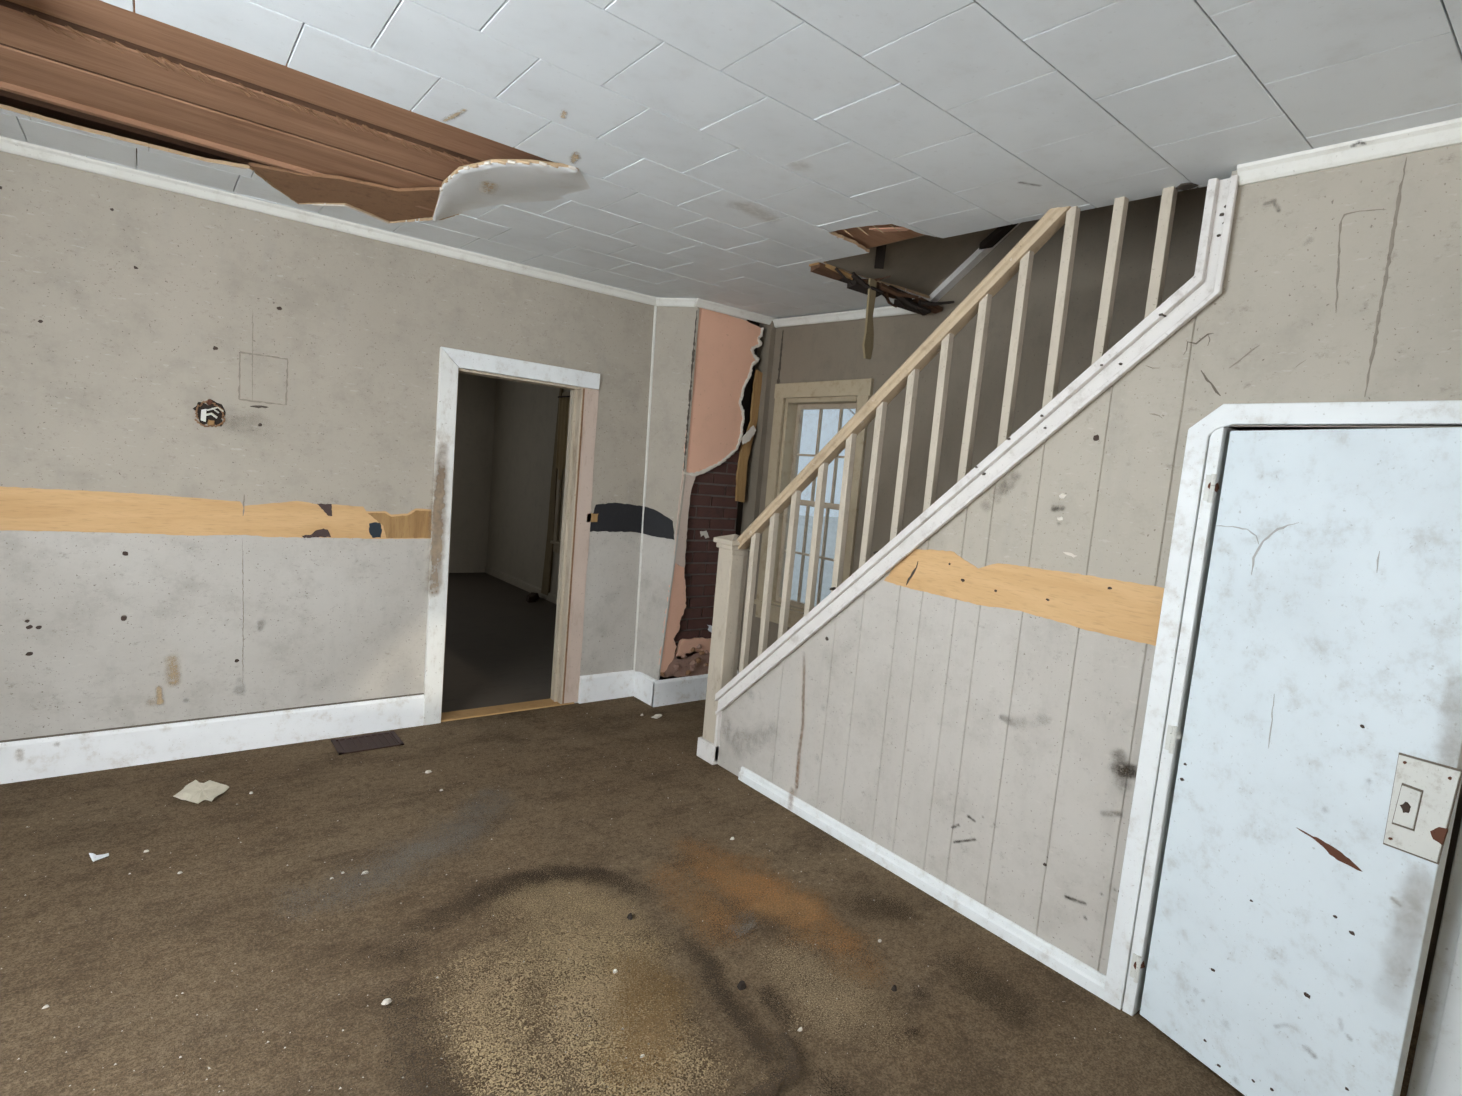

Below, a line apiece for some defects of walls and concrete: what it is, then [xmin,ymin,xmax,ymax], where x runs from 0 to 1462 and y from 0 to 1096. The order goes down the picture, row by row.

flaking render [674,327,764,654]